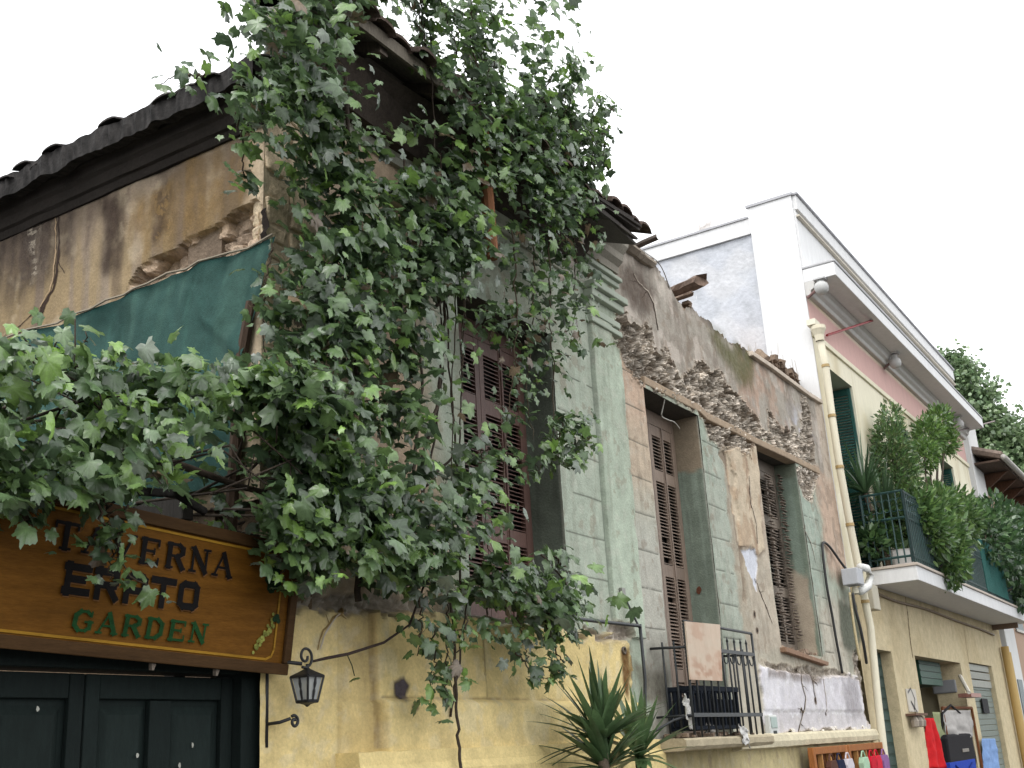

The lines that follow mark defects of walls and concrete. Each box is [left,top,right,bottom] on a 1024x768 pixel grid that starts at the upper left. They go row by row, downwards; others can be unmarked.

water stain [0,220,51,287]
crack [3,216,64,337]
water stain [102,200,119,272]
spalling [126,196,263,292]
spalling [612,311,820,593]
crack [796,668,827,732]
spalling [760,648,870,733]